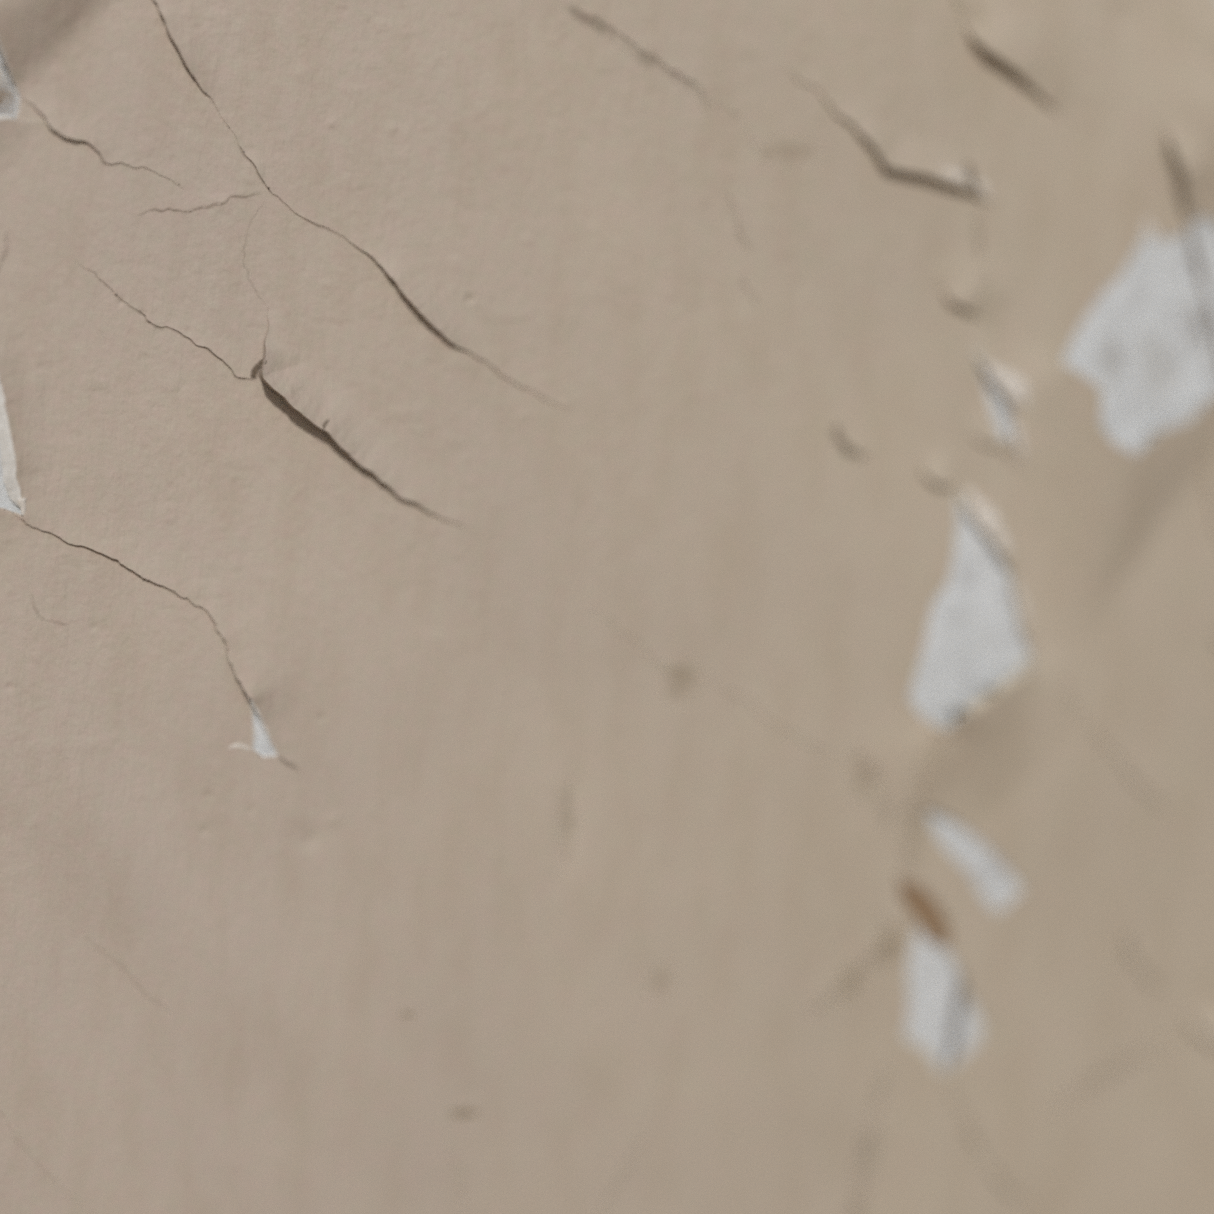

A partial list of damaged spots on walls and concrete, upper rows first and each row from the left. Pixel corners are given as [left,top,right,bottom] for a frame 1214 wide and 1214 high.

peeling [0,0,116,172]
crack [21,89,181,188]
crack [154,0,568,408]
peeling [784,63,999,203]
peeling [0,298,55,542]
crack [12,507,240,648]
peeling [860,197,1214,913]
peeling [903,918,991,1074]